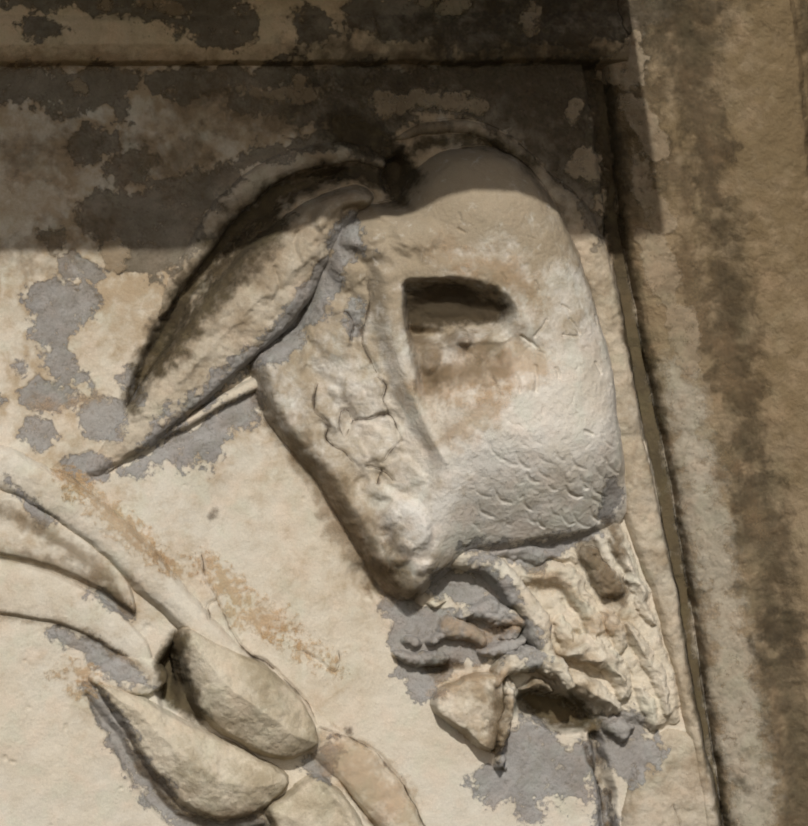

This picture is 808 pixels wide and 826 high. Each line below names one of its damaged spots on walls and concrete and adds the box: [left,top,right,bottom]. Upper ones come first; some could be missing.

peeling [0,0,607,484]
peeling [339,0,776,826]
damp [733,477,797,641]